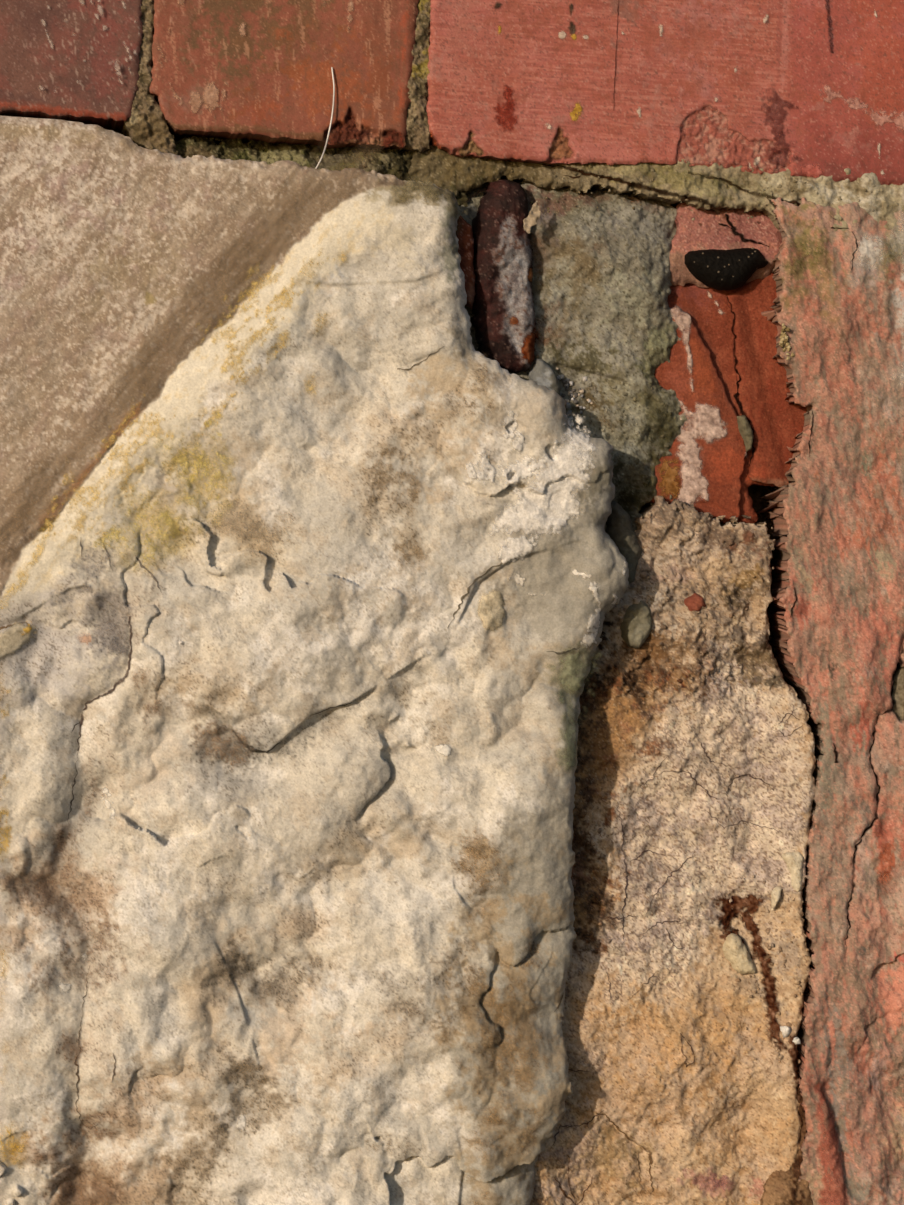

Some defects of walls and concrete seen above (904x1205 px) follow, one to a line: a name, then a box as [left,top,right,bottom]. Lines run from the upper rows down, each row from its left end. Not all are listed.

spalling [676,105,791,171]
corrosion [510,316,539,365]
spalling [647,203,807,524]
crack [67,616,132,822]
crack [232,730,282,753]
crack [643,740,780,832]
crack [774,709,803,737]
crack [845,647,904,949]
crack [600,802,695,951]
corrosion [715,881,806,1119]
crack [550,1110,654,1205]
corrosion [789,1155,805,1205]